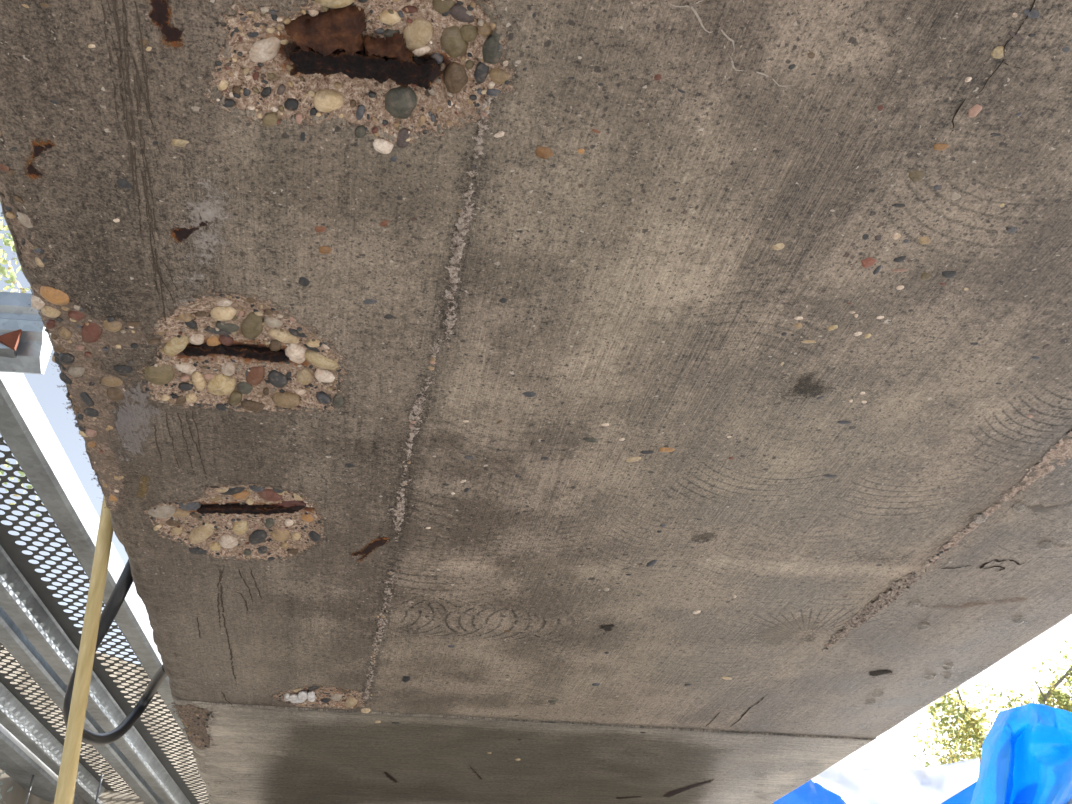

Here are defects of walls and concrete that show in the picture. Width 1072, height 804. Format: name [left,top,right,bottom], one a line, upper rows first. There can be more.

rust [149,0,183,48]
crack [950,0,1035,134]
rust [26,140,56,179]
rust [171,221,208,243]
spalling [202,0,519,539]
spalling [0,163,348,516]
spalling [143,483,328,562]
rust [351,537,391,562]
crack [942,560,1024,572]
spalling [271,571,398,713]